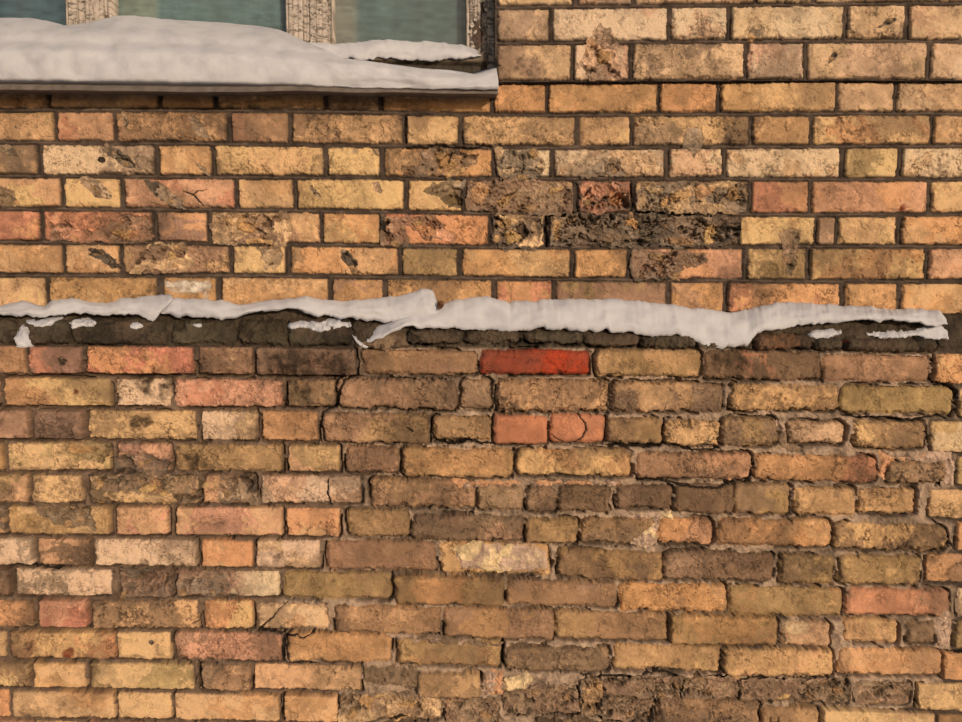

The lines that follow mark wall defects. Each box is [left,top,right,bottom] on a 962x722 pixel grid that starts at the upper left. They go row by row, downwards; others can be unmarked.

spalling [579,23,621,82]
spalling [379,213,457,249]
spalling [400,146,748,282]
crack [551,413,719,451]
crack [633,458,754,489]
spalling [337,675,742,722]
spalling [853,680,913,706]